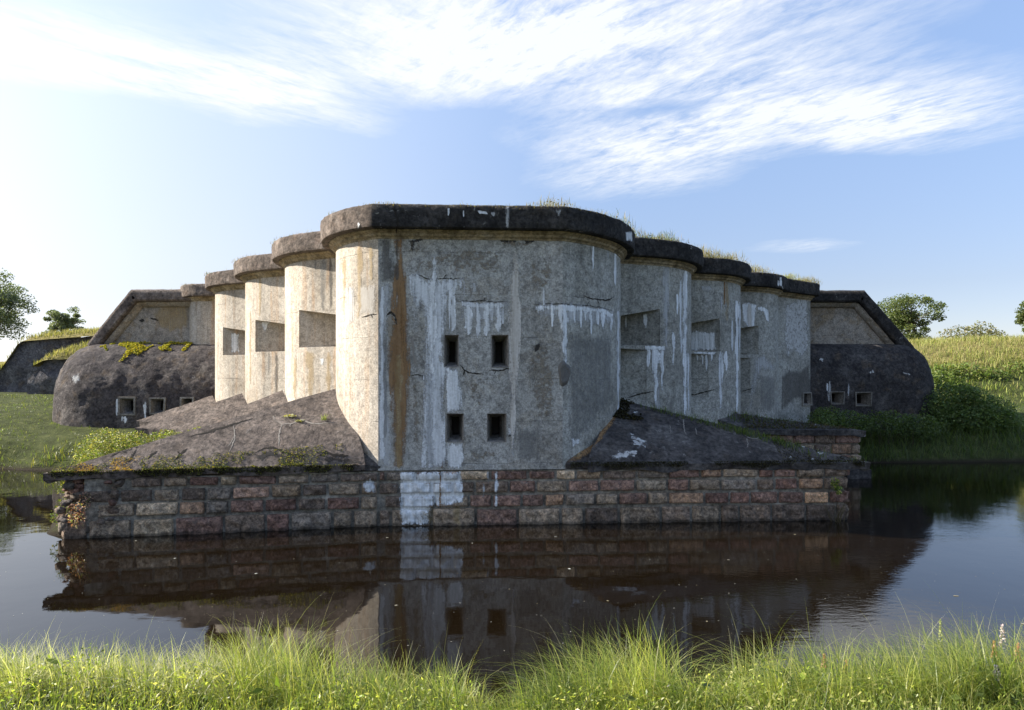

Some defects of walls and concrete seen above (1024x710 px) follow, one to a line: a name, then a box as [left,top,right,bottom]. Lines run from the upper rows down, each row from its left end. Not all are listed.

corrosion [388,239,411,467]
leakage [399,245,521,525]
crack [460,365,509,375]
leakage [536,287,627,410]
leakage [645,268,769,414]